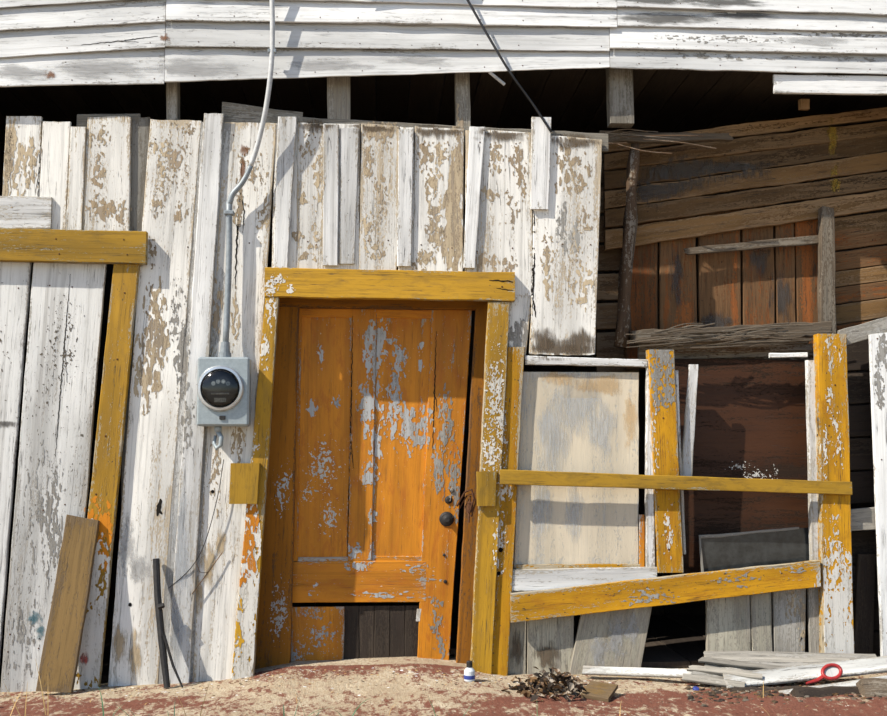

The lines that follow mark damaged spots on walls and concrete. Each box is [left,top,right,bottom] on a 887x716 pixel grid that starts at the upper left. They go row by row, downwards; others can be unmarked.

water stain [624,0,771,23]
peeling [148,122,196,227]
peeling [410,103,466,271]
peeling [480,142,528,229]
peeling [540,138,597,313]
peeling [132,236,195,459]
peeling [356,317,462,524]
peeling [481,318,528,471]
water stain [532,328,595,360]
peeling [642,349,678,472]
peeling [874,327,887,410]
peeling [271,434,346,537]